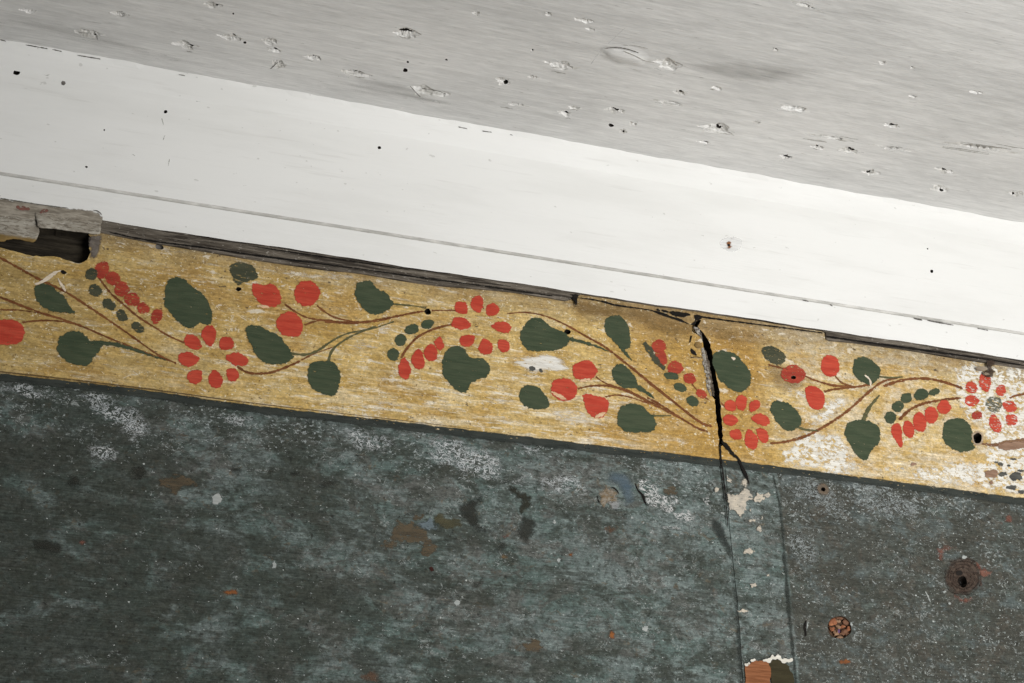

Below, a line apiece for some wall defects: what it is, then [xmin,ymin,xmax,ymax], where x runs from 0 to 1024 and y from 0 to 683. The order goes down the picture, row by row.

crack [110,232,1022,683]
peeling [635,479,694,529]
peeling [705,477,770,552]
peeling [734,581,794,683]